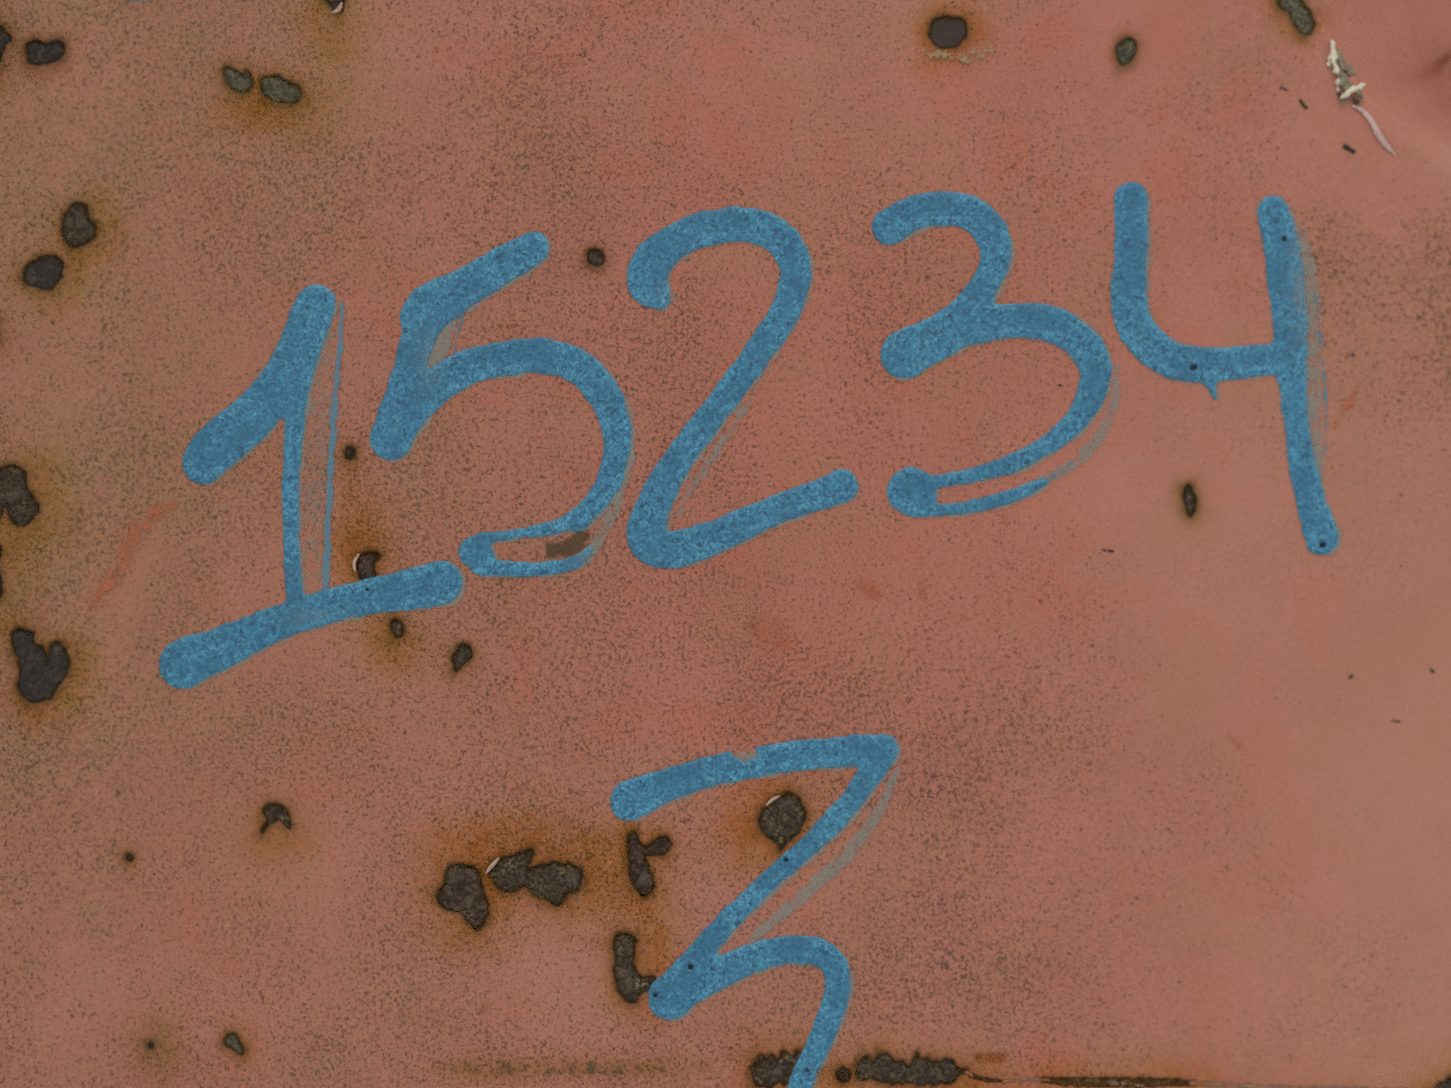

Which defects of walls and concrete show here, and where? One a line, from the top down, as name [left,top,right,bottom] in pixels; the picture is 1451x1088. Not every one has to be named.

spalling [0,26,65,65]
spalling [23,202,96,291]
spalling [0,465,40,527]
spalling [11,628,70,703]
crack [964,1071,1401,1088]